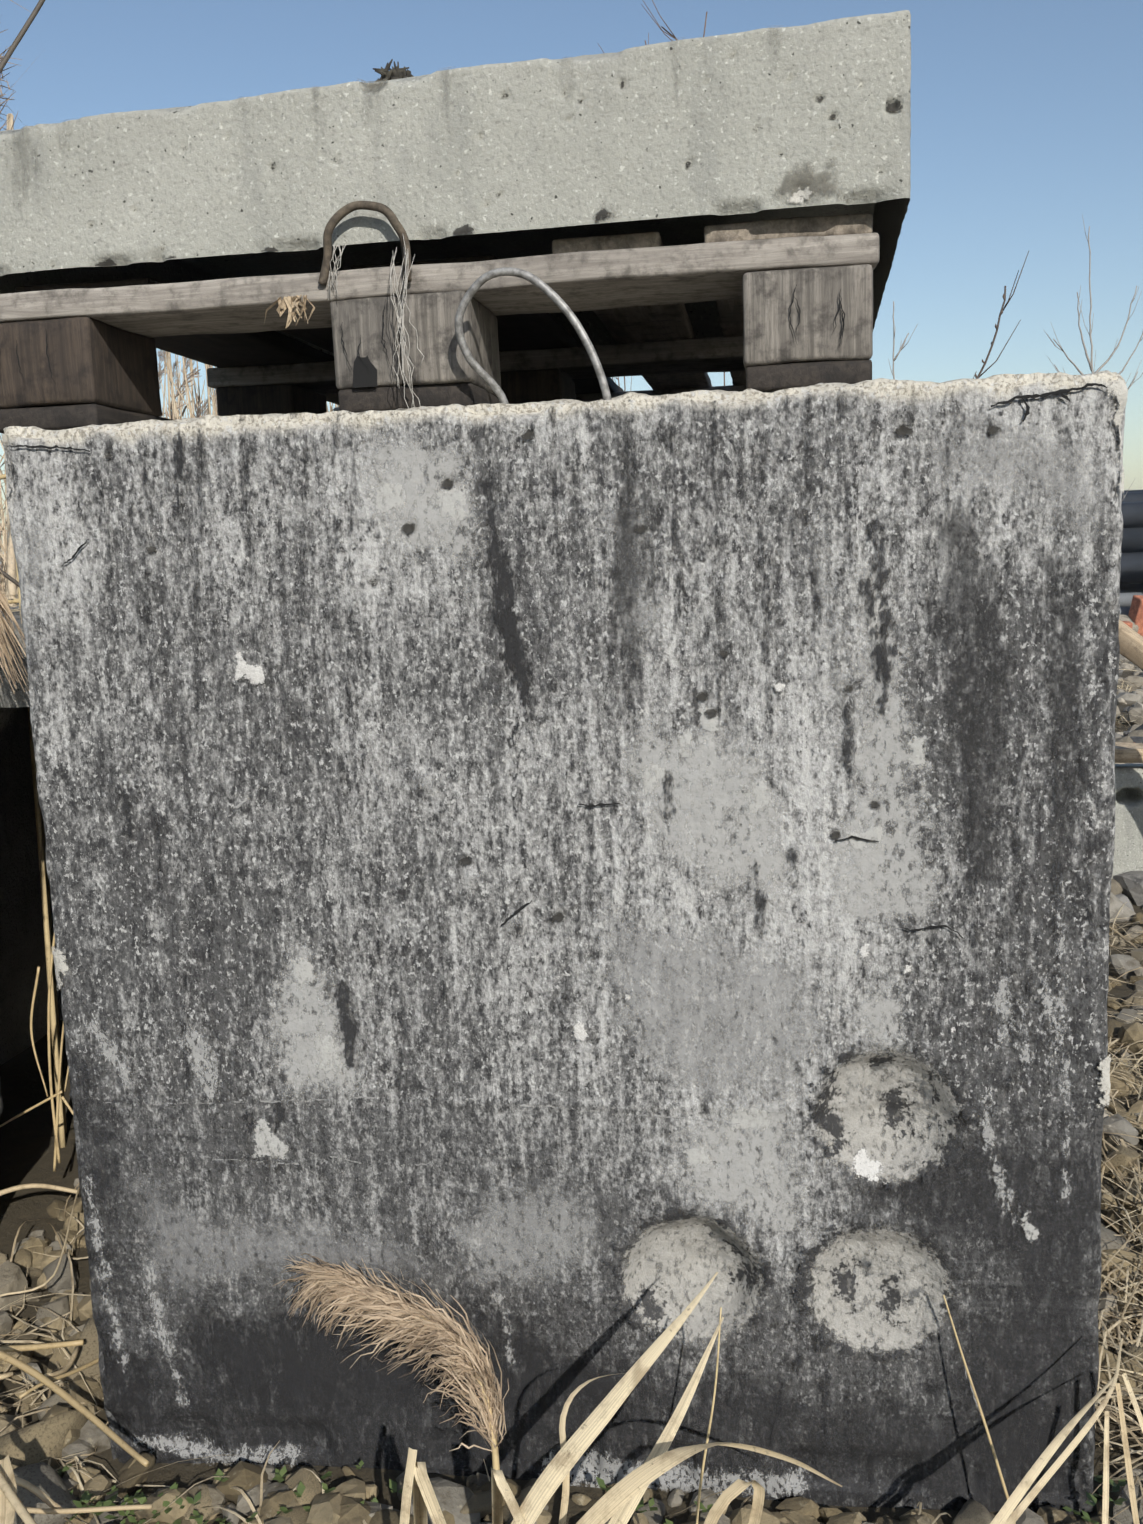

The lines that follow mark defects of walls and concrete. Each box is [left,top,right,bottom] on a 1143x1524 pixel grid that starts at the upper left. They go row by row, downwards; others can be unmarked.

leakage [170,430,205,673]
peeling [234,650,266,685]
leakage [476,426,533,752]
leakage [758,521,772,703]
leakage [841,690,857,788]
leakage [859,518,898,715]
leakage [934,488,1012,904]
leakage [754,862,770,938]
leakage [334,979,360,1067]
peeling [252,1118,289,1160]
peeling [604,961,984,1365]
leakage [69,1064,1099,1515]